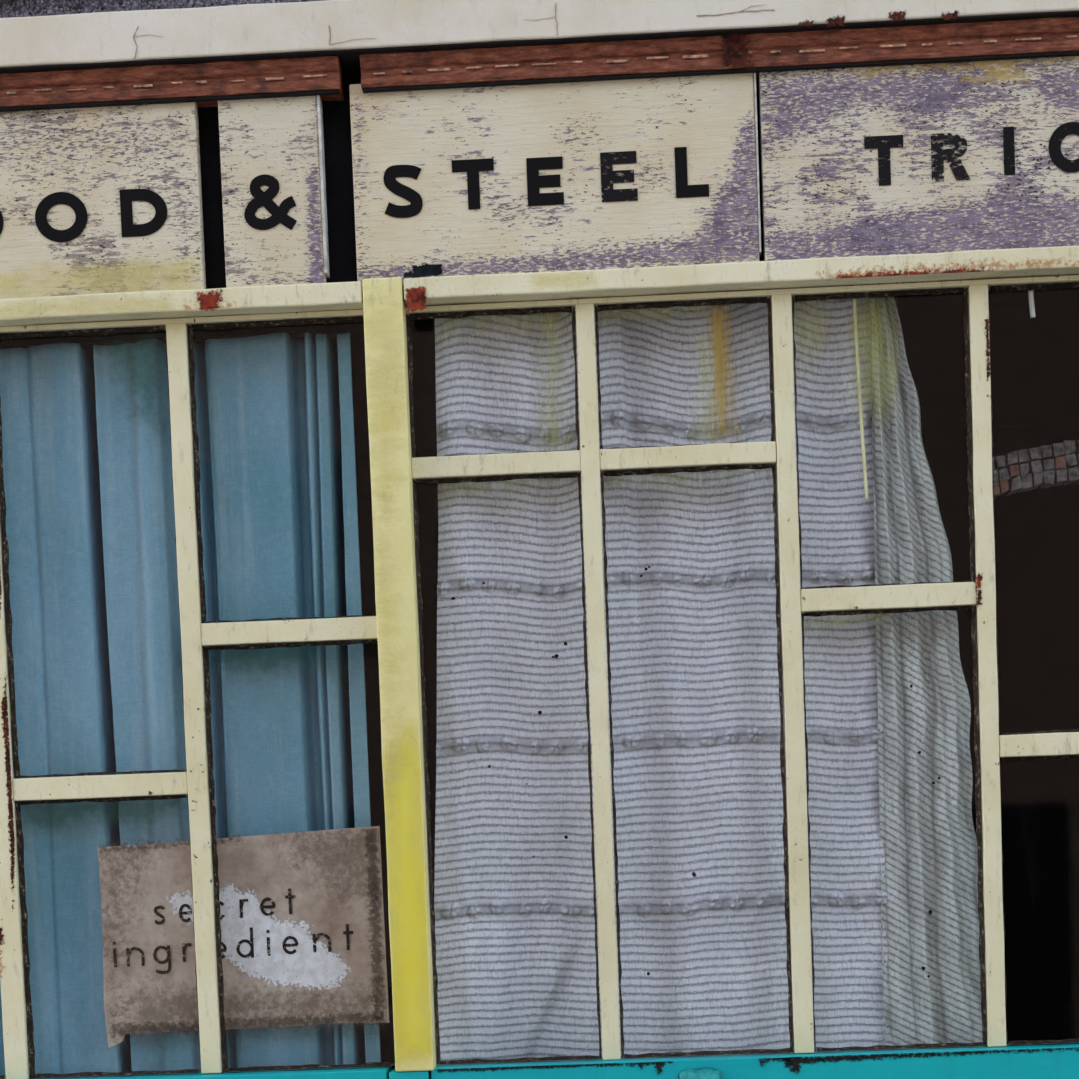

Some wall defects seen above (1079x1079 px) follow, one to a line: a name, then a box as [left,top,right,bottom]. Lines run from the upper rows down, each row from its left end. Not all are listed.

peeling [0,106,200,277]
rust [183,289,230,311]
rust [405,286,427,313]
peeling [350,33,1079,283]
rust [819,259,1079,286]
rust [1,671,15,912]